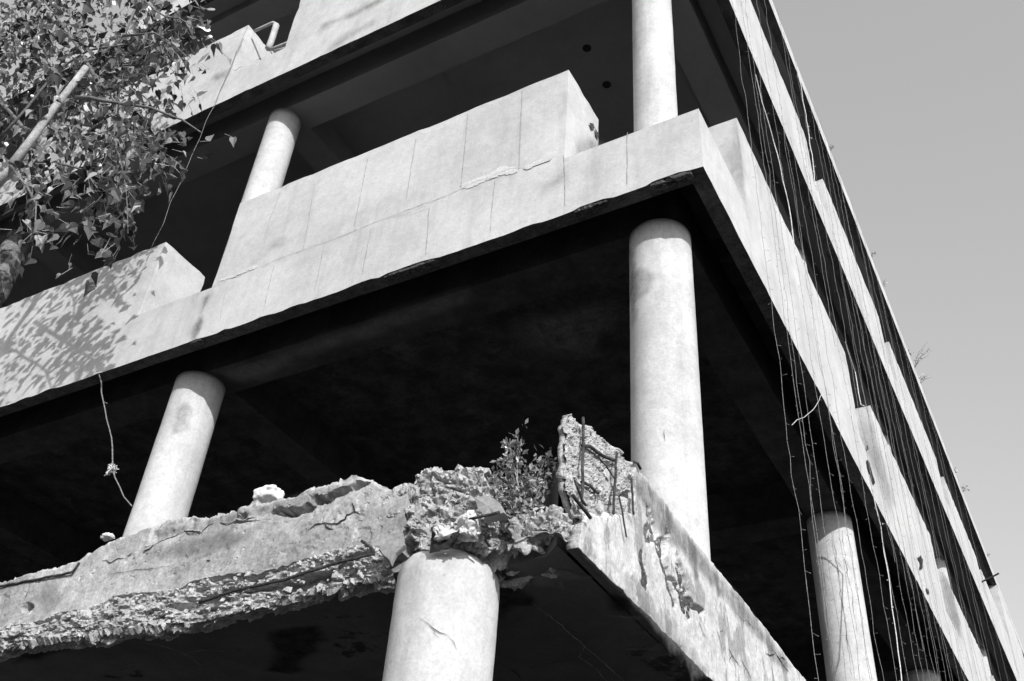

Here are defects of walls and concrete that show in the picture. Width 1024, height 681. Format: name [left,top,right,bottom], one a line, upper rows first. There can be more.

spalling [0,539,407,662]
crack [308,503,365,530]
spalling [468,504,575,591]
spalling [638,512,690,619]